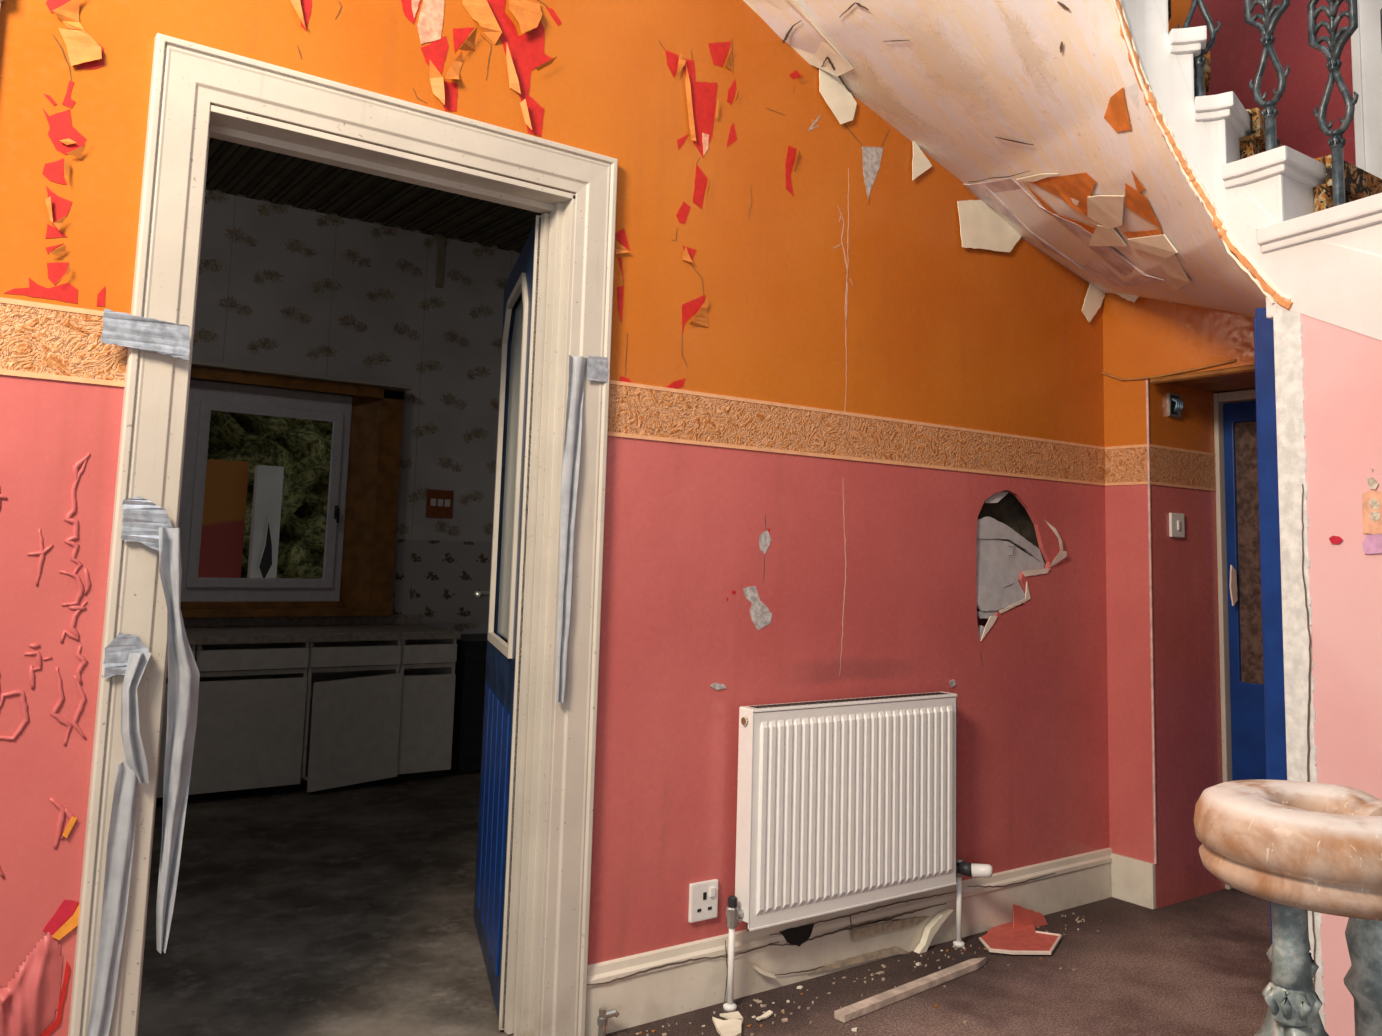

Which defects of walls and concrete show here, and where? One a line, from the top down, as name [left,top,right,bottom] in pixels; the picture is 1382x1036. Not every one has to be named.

peeling [290,0,312,59]
peeling [401,0,562,136]
peeling [5,0,104,303]
peeling [659,40,740,389]
peeling [97,287,105,307]
flaking render [726,515,772,630]
spalling [976,491,1067,664]
peeling [807,916,930,974]